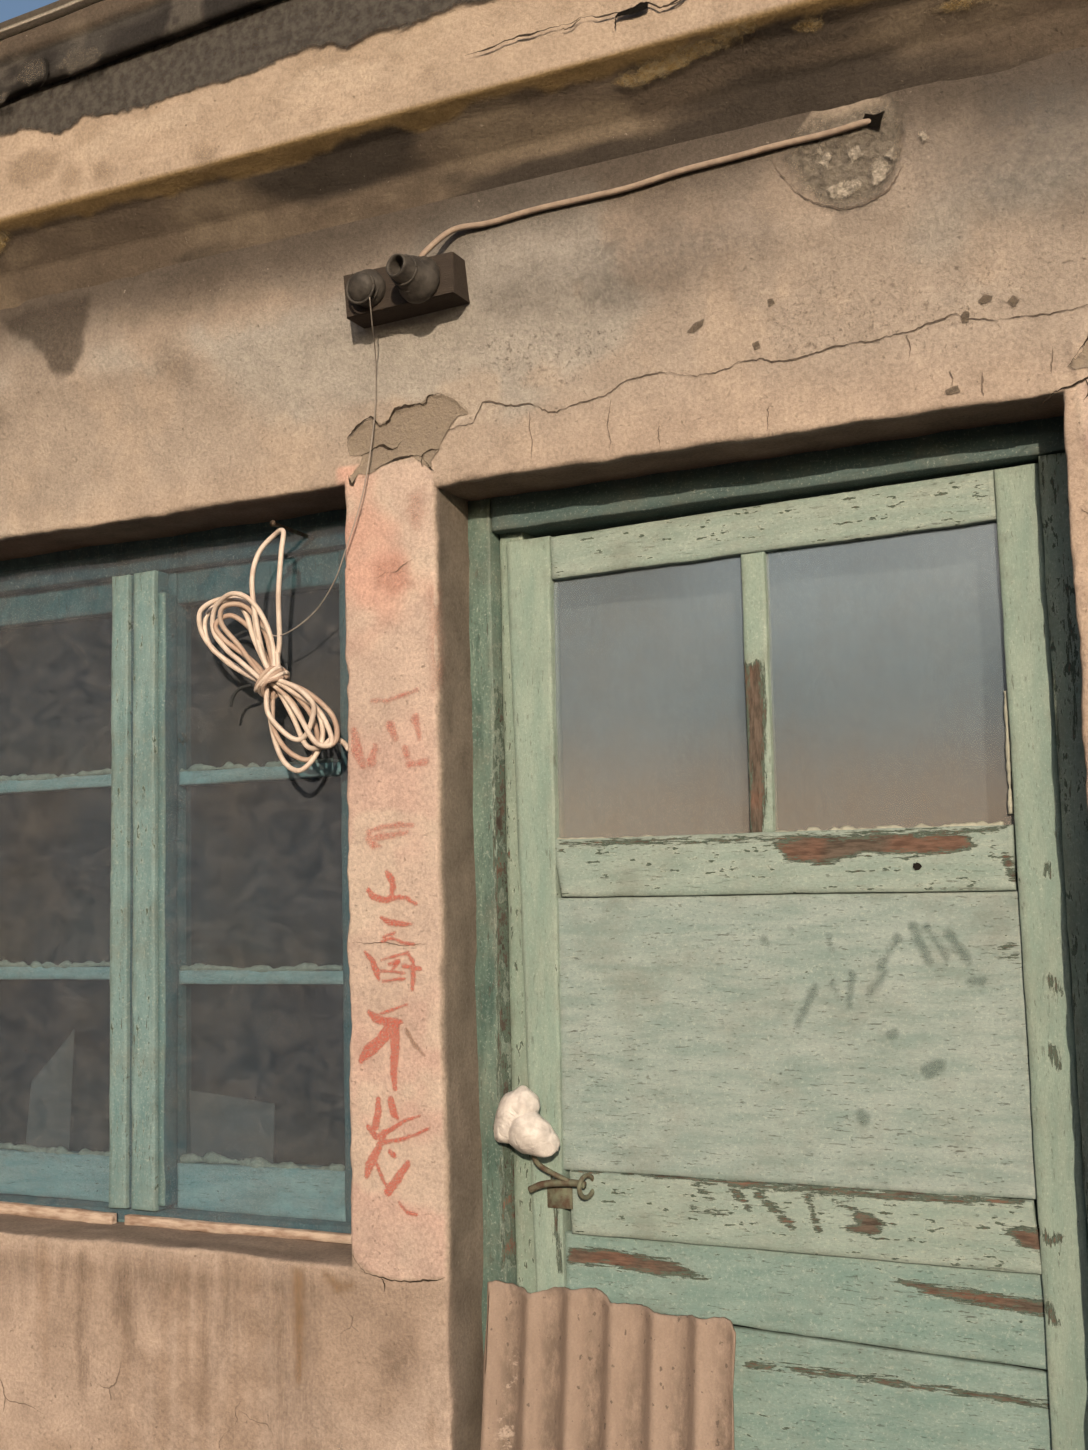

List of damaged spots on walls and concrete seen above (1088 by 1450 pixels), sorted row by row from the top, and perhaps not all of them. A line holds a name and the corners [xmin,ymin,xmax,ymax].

crack [468,0,681,55]
leakage [10,298,88,371]
crack [449,304,1088,456]
spalling [1068,337,1088,370]
spalling [347,393,468,485]